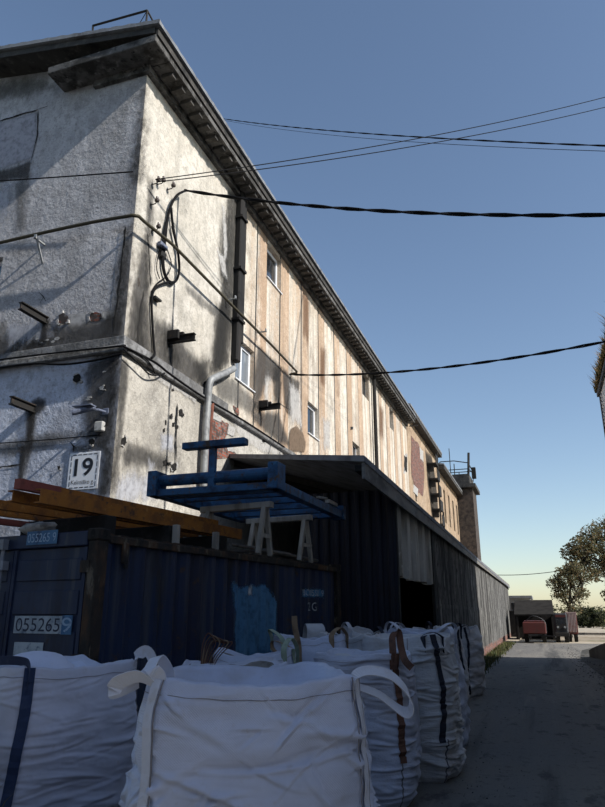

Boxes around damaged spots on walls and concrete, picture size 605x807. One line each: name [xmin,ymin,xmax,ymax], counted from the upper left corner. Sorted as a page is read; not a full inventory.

damp [0,162,30,226]
peeling [56,310,116,330]
damp [0,186,229,387]
damp [218,347,300,445]